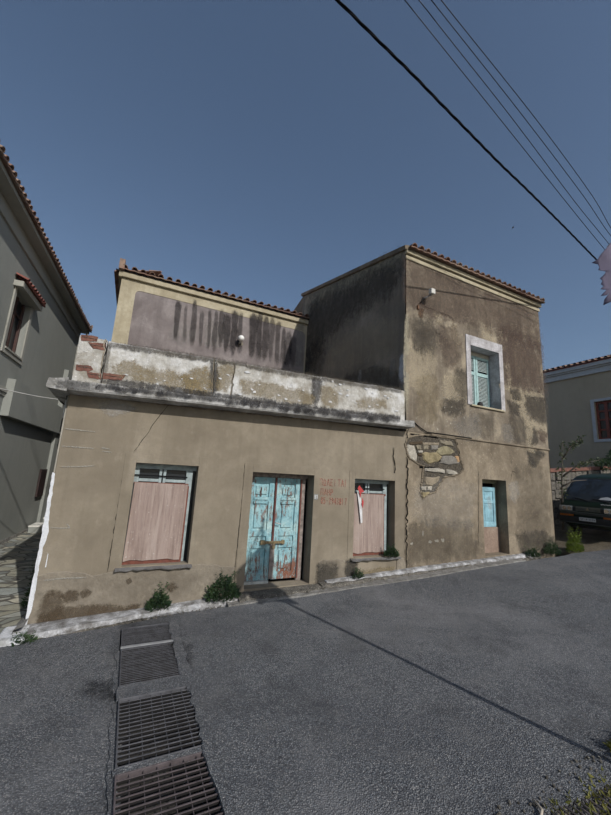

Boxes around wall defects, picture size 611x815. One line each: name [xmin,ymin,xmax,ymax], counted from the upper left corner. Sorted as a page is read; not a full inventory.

flaking render [81,335,105,350]
peeling [75,360,392,409]
water stain [66,259,549,467]
spalling [404,375,480,499]